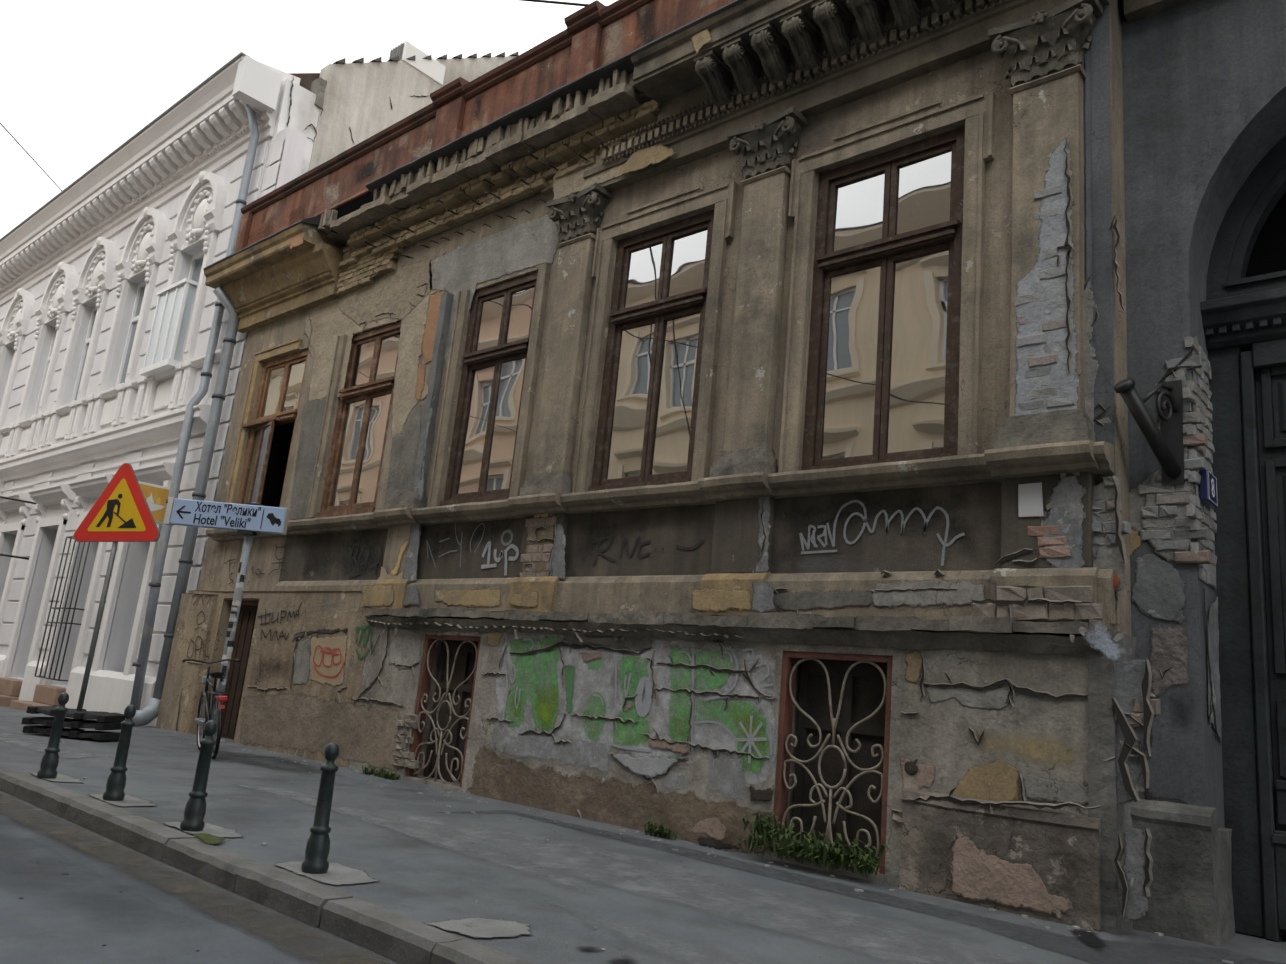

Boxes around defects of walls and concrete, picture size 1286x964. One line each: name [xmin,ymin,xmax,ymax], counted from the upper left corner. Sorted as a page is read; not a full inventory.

flaking render [305,100,677,439]
flaking render [1014,135,1113,431]
flaking render [435,516,557,608]
flaking render [972,336,1217,643]
crack [335,620,776,793]
flaking render [946,836,1073,918]
crack [901,652,1171,916]